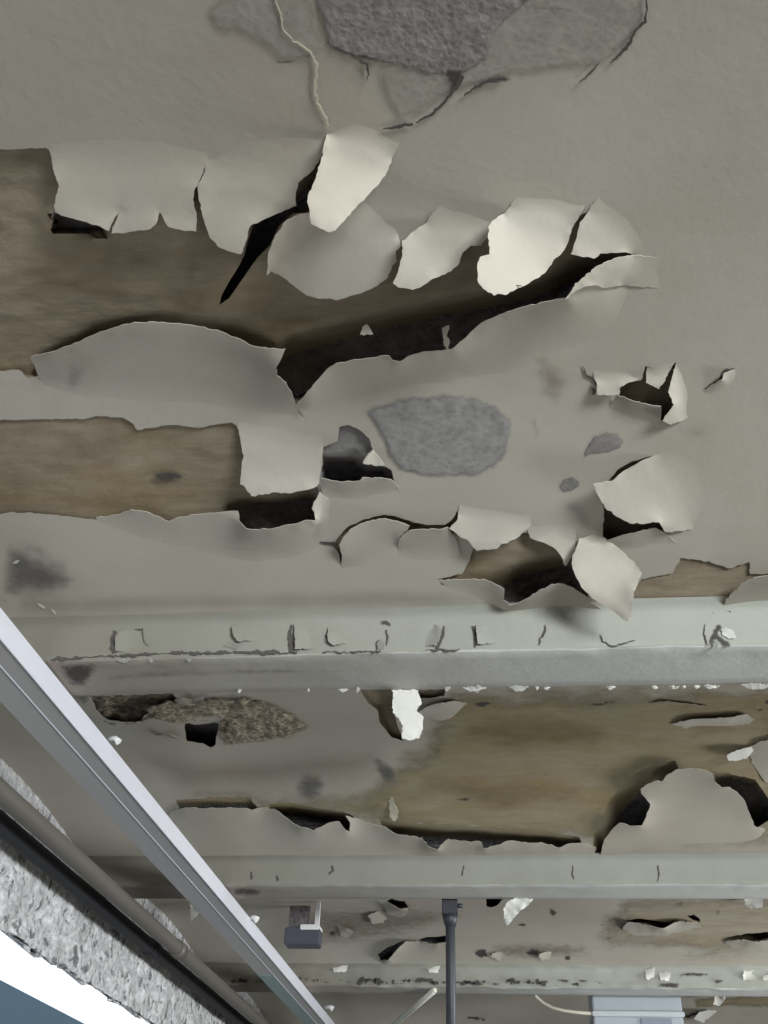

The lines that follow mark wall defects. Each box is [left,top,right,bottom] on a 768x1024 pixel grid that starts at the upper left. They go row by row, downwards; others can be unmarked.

crack [275,0,329,128]
flaking render [211,0,642,115]
peeling [0,125,768,622]
leakage [13,556,58,586]
crack [109,628,148,654]
crack [288,623,314,651]
crack [424,624,445,649]
crack [600,635,635,647]
spalling [78,689,307,747]
peeling [168,683,768,856]
peeling [486,898,533,926]
peeling [605,899,768,951]